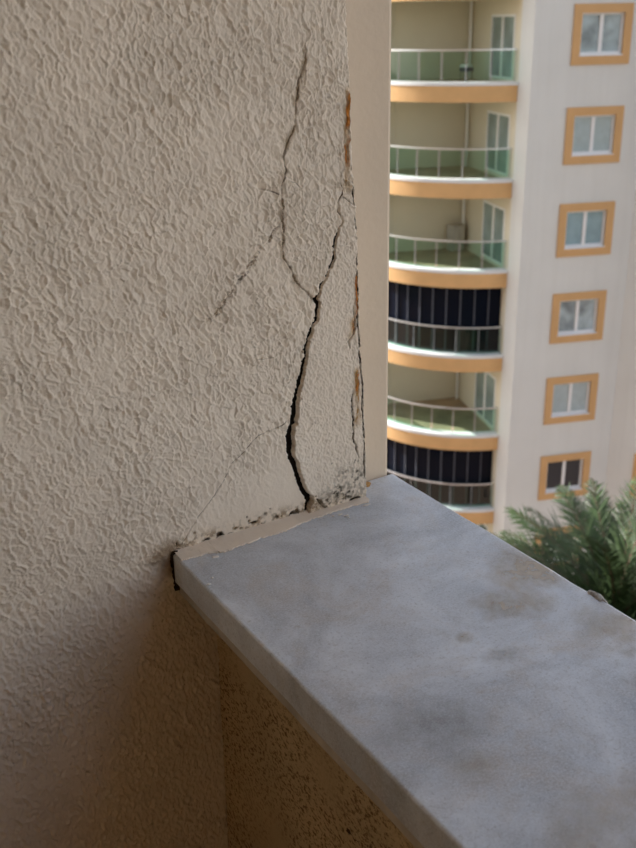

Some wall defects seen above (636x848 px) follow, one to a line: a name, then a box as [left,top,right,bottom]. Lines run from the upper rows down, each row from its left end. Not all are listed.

crack [238,127,355,510]
crack [348,257,365,464]